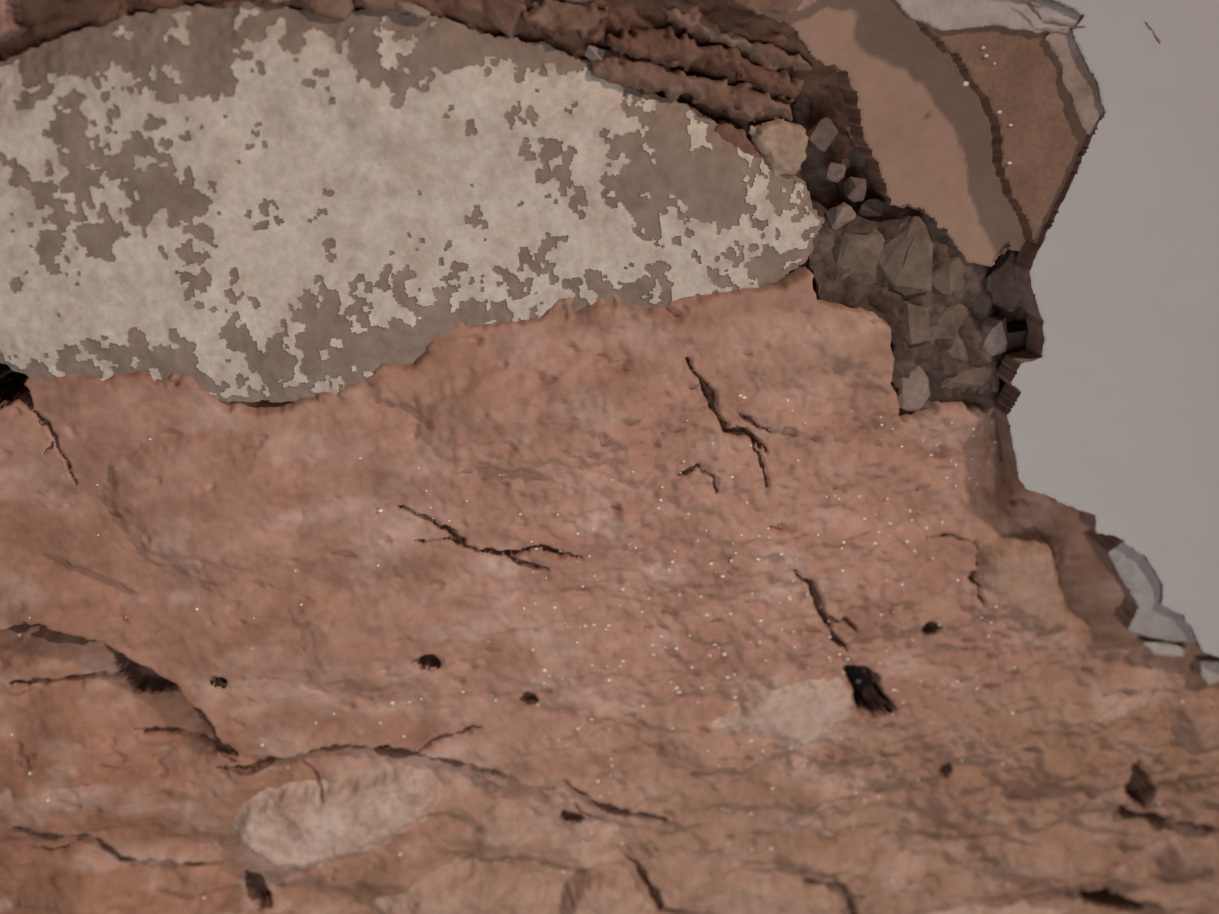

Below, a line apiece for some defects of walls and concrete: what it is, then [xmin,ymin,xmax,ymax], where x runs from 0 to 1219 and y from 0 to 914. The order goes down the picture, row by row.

peeling [0,0,1219,686]
crack [27,403,77,482]
crack [677,464,718,492]
crack [685,357,769,487]
crack [8,622,496,792]
crack [563,780,667,821]